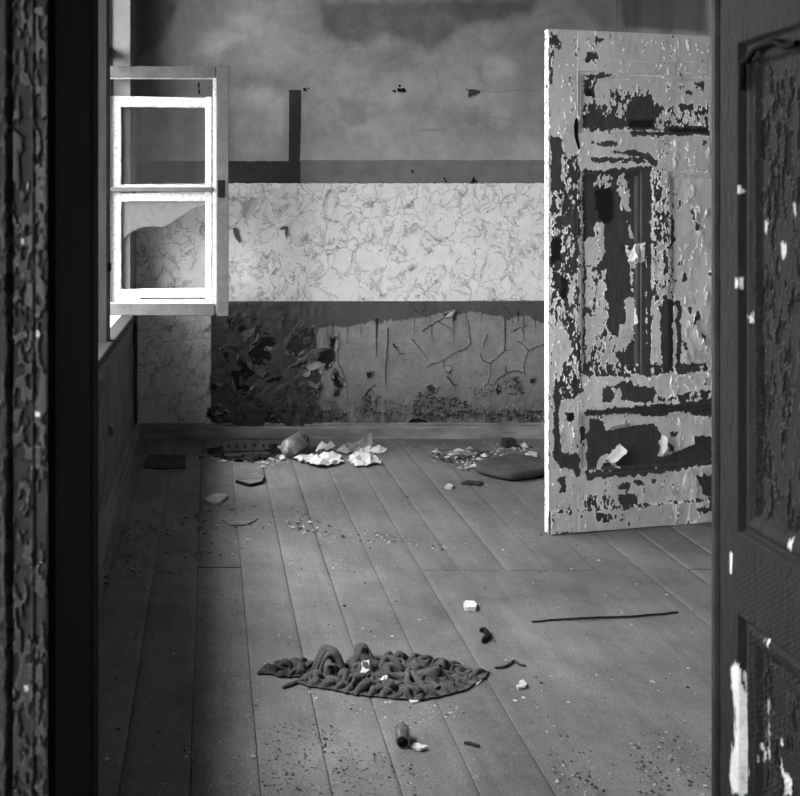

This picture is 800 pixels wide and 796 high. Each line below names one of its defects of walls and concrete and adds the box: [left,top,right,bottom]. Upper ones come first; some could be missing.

peeling [627,244,642,262]
peeling [206,314,350,423]
crack [282,304,545,403]
peeling [602,445,627,463]